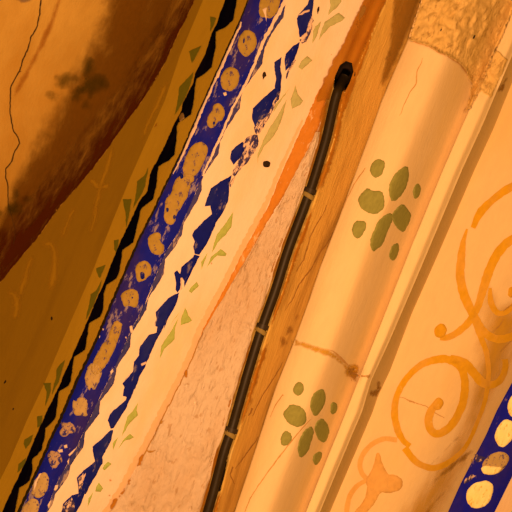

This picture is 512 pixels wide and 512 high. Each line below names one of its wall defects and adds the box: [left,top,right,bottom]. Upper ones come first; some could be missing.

crack [5,0,42,244]
spalling [408,0,512,112]